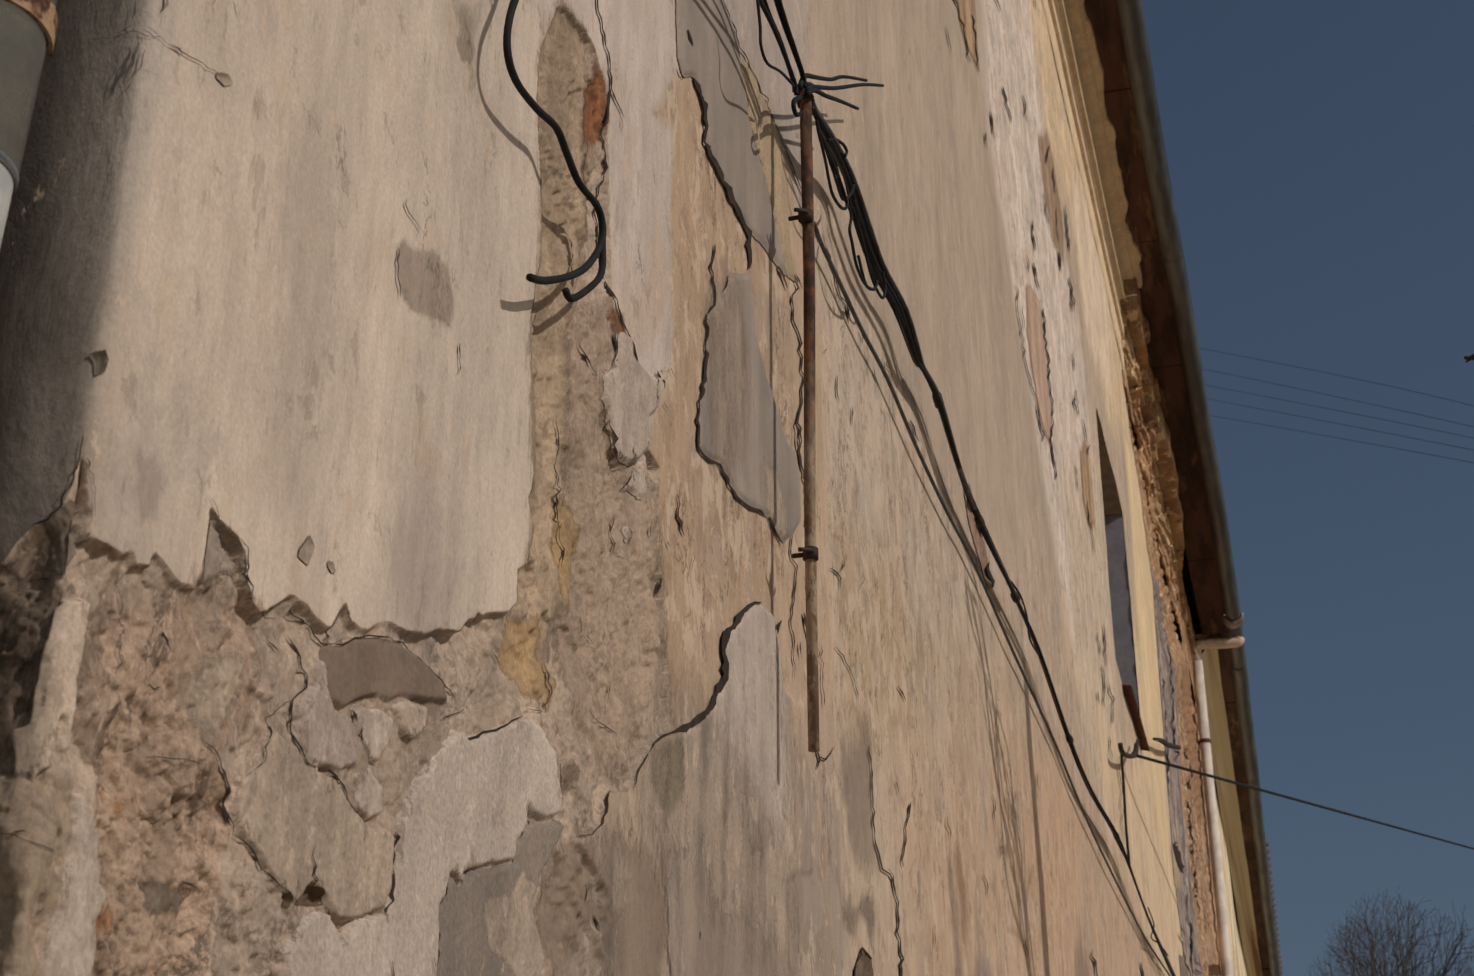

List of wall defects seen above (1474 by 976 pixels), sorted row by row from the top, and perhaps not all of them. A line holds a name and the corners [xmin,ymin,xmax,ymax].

peeling [741,61,798,289]
peeling [946,0,980,72]
peeling [985,87,1038,148]
peeling [1012,132,1075,480]
flaking render [0,0,674,976]
peeling [1074,392,1096,551]
peeling [1097,629,1125,845]
flaking render [1120,277,1222,976]
flaking render [844,896,875,976]
crack [817,747,936,976]